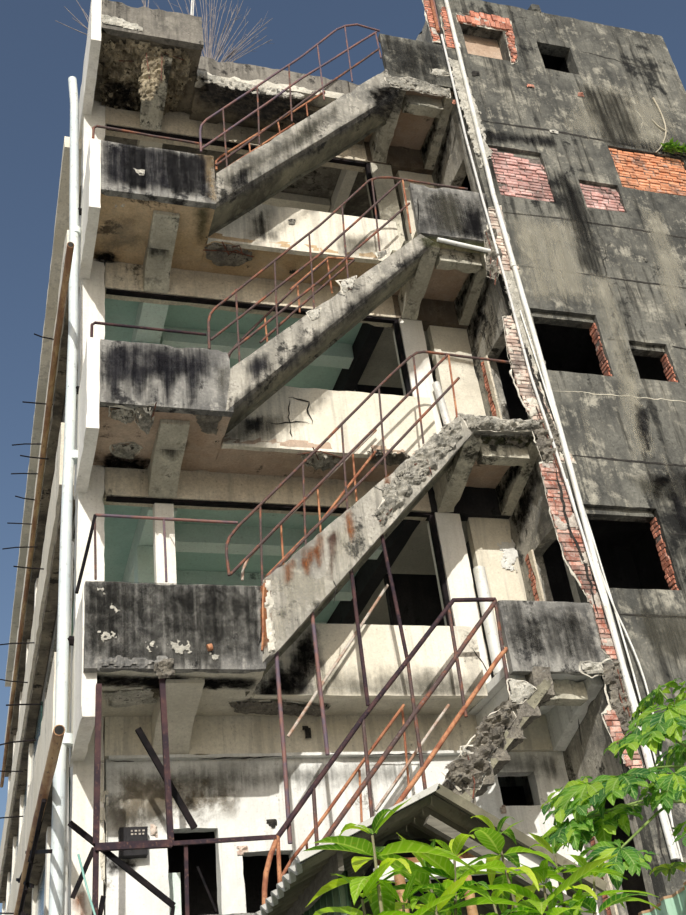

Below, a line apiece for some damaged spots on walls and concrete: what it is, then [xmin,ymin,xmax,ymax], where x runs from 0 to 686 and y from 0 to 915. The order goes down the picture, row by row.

spalling [99,14,304,115]
water stain [105,144,213,194]
spalling [203,241,255,268]
water stain [101,344,209,403]
crack [489,282,550,424]
crack [565,391,684,402]
flaking render [366,205,645,769]
rust [286,533,336,580]
crack [554,451,686,619]
water stain [86,581,259,665]
mould [261,633,323,695]
spalling [441,678,537,799]